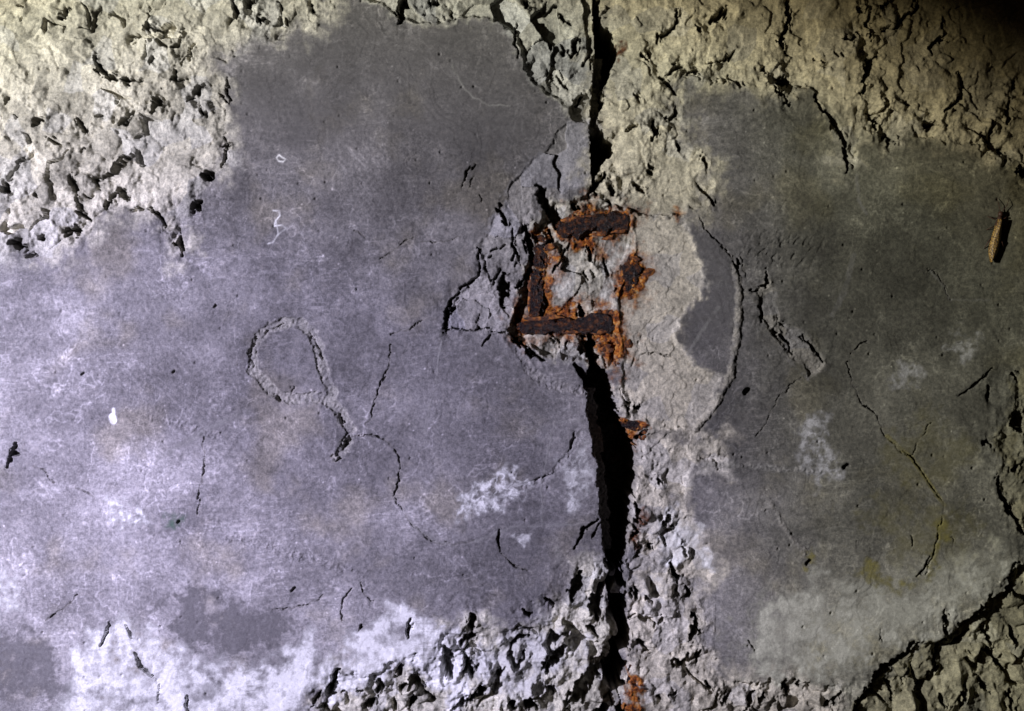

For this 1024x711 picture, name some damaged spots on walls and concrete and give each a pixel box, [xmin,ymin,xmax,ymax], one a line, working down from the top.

spalling [0,0,335,262]
crack [352,320,529,572]
corrosion [513,305,532,345]
crack [573,518,601,550]
corrosion [529,203,656,366]
corrosion [611,418,648,445]
spalling [364,0,1024,711]
crack [700,218,736,260]
crack [846,341,955,577]
spalling [313,558,610,711]
corrosion [619,668,647,711]